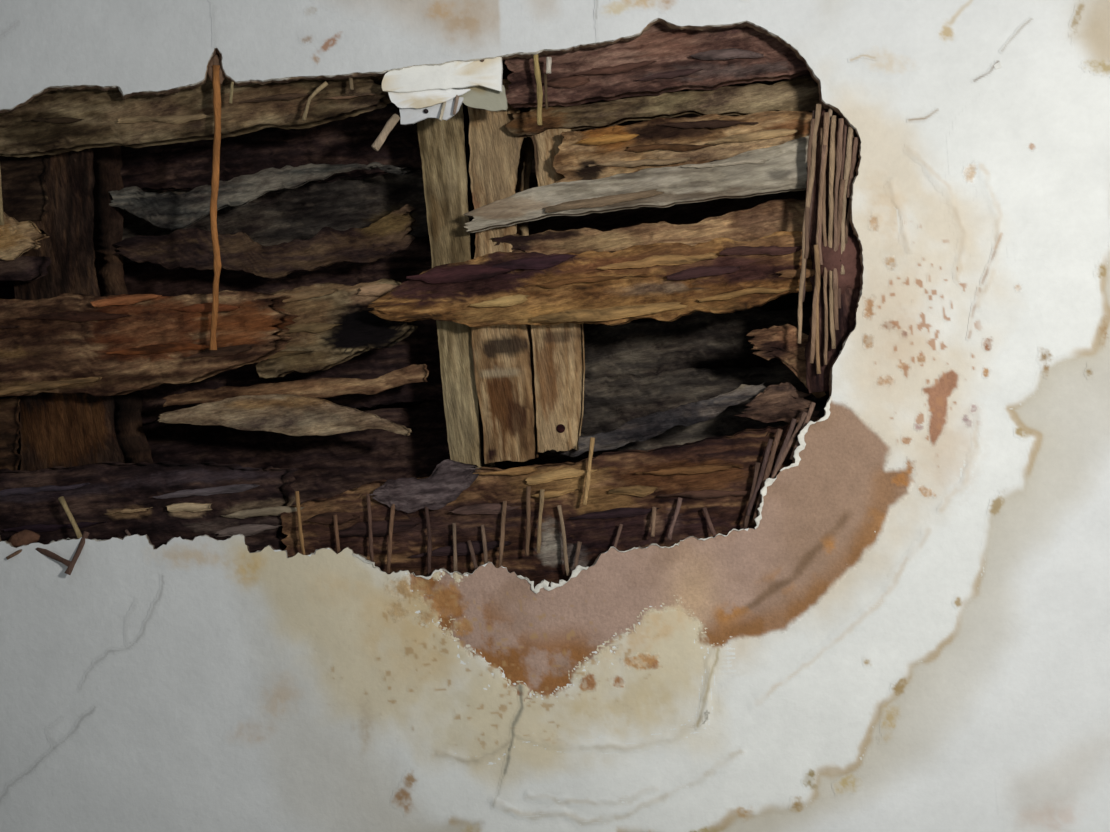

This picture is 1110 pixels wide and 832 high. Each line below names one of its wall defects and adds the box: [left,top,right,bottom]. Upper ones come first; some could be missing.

water stain [299,0,504,66]
water stain [598,0,680,19]
water stain [780,30,800,44]
water stain [936,0,977,46]
water stain [1062,0,1110,77]
spalling [0,18,979,705]
spalling [981,366,992,379]
spalling [981,336,994,352]
water stain [140,44,1030,832]
water stain [684,237,1110,832]